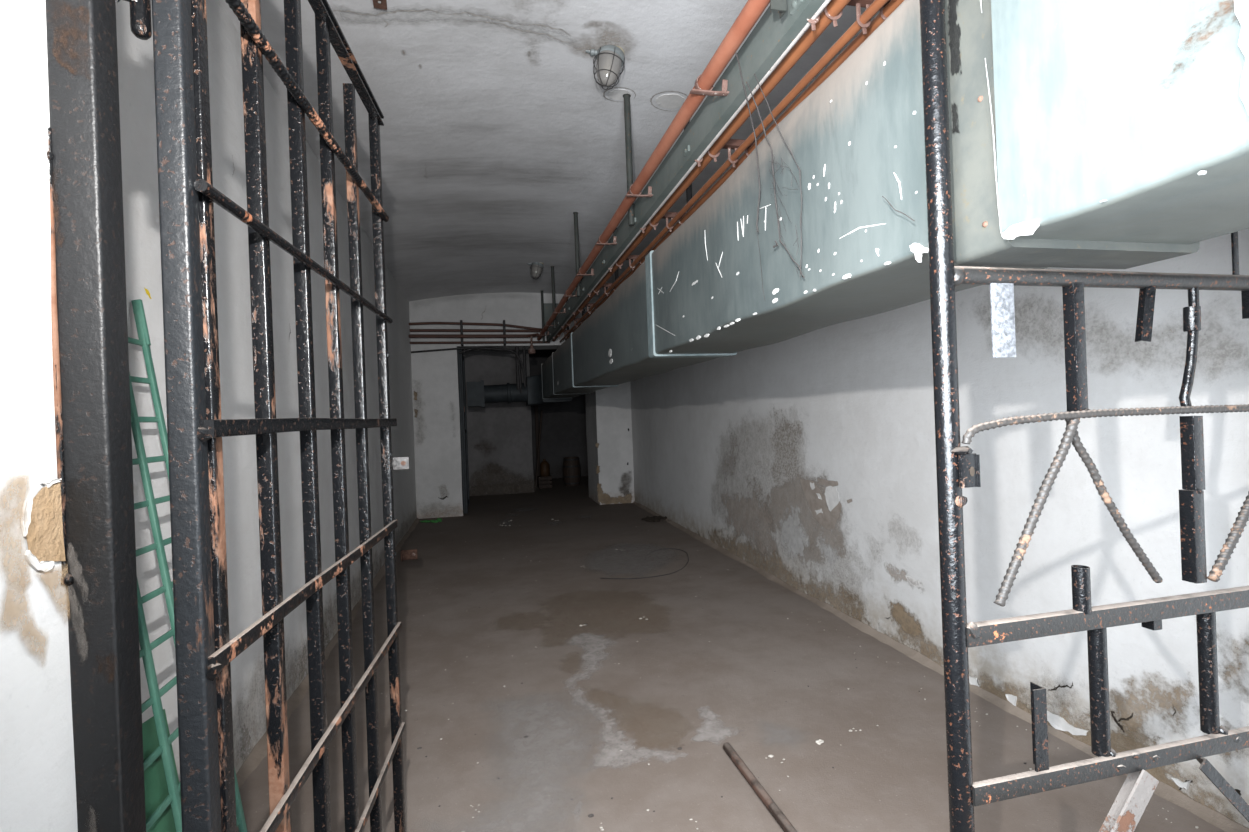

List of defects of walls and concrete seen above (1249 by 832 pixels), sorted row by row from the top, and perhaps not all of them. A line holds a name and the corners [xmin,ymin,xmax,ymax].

rust [1186,0,1234,43]
spalling [20,479,66,572]
water stain [708,411,870,625]
spalling [1207,491,1249,582]
water stain [486,633,686,832]
water stain [693,707,736,741]